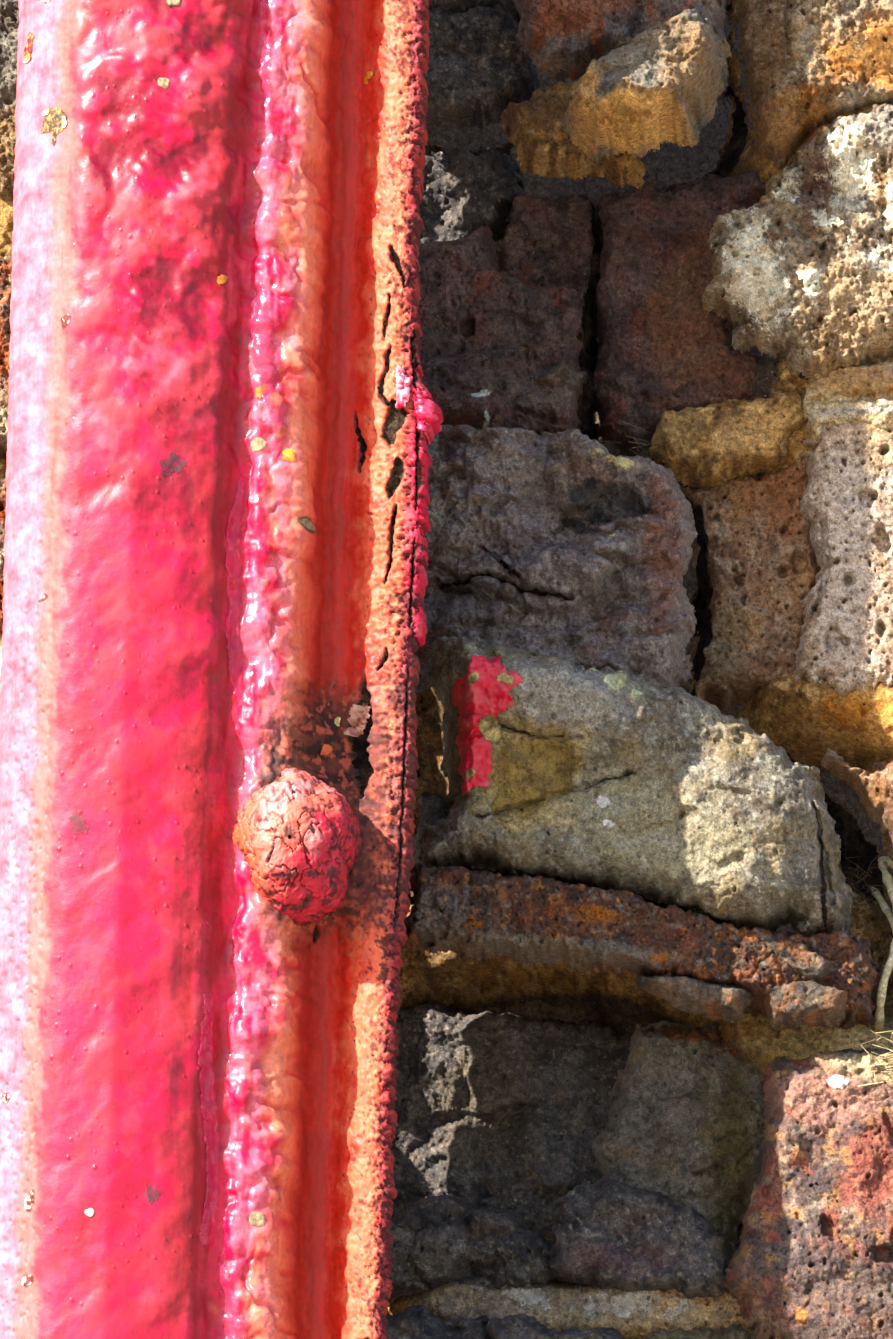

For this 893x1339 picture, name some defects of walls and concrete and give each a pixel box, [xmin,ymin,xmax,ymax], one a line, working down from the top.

crack [355,247,572,626]
crack [576,203,610,454]
crack [685,497,713,697]
crack [347,651,733,925]
crack [786,752,884,930]